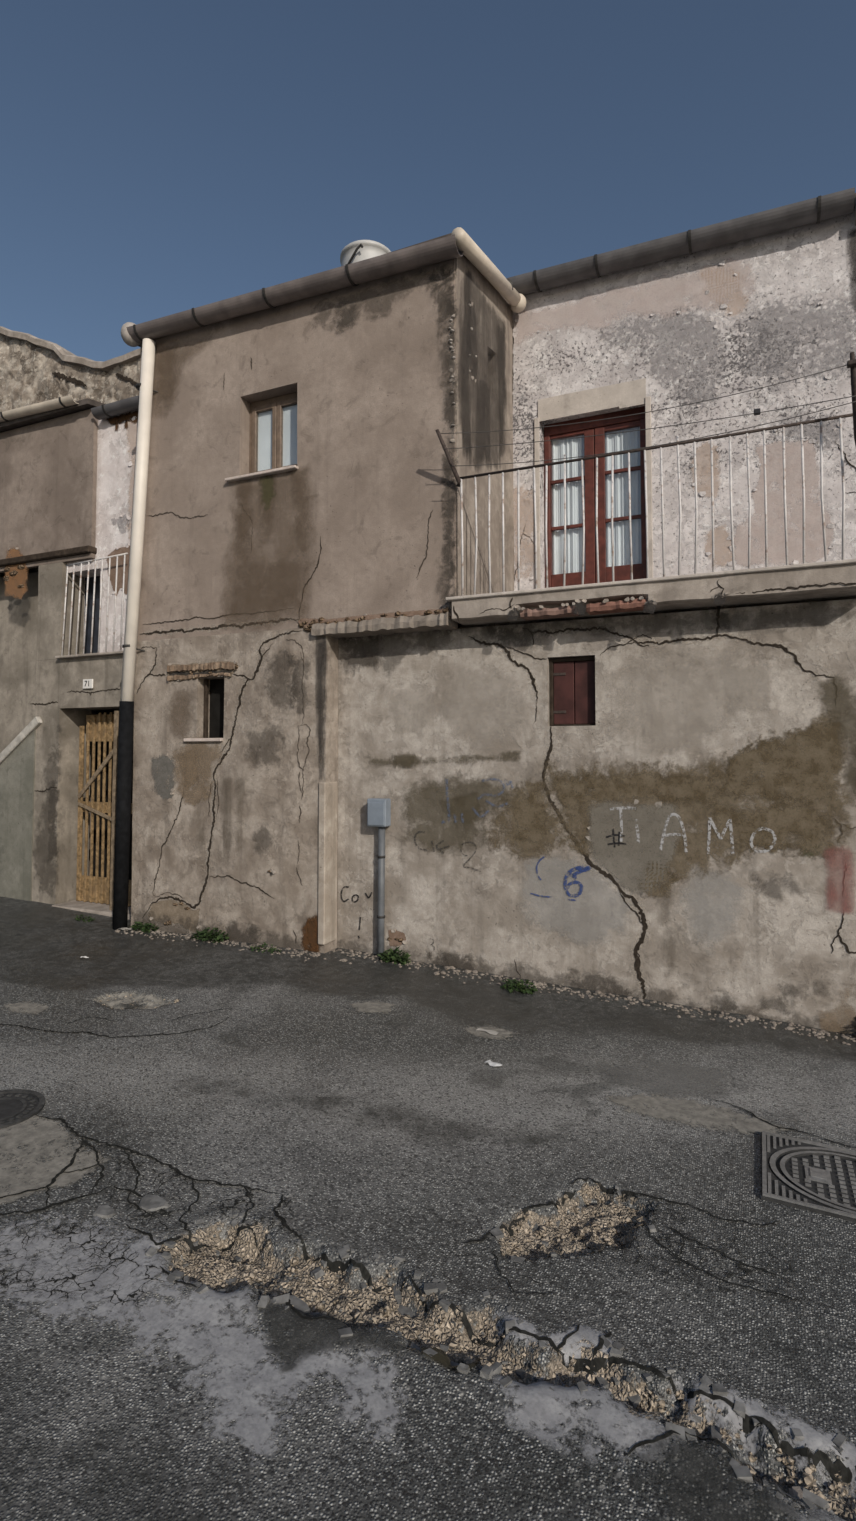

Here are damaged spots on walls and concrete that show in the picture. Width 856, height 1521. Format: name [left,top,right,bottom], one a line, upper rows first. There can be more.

crack [32,537,322,918]
crack [453,523,856,999]
peeling [586,799,681,898]
crack [0,1140,313,1305]
crack [598,1199,825,1300]